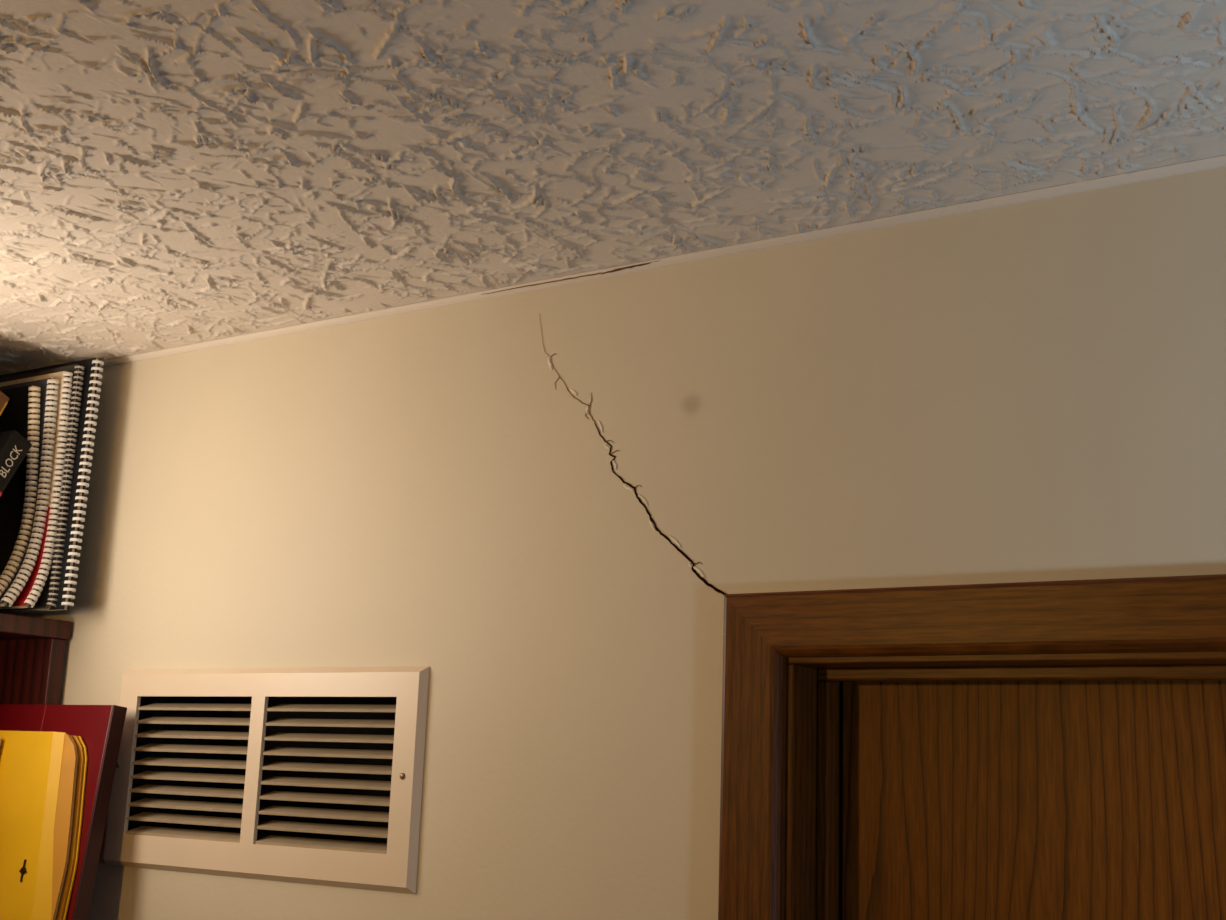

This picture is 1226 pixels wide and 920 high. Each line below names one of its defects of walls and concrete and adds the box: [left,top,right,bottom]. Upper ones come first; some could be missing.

crack [481,260,727,595]